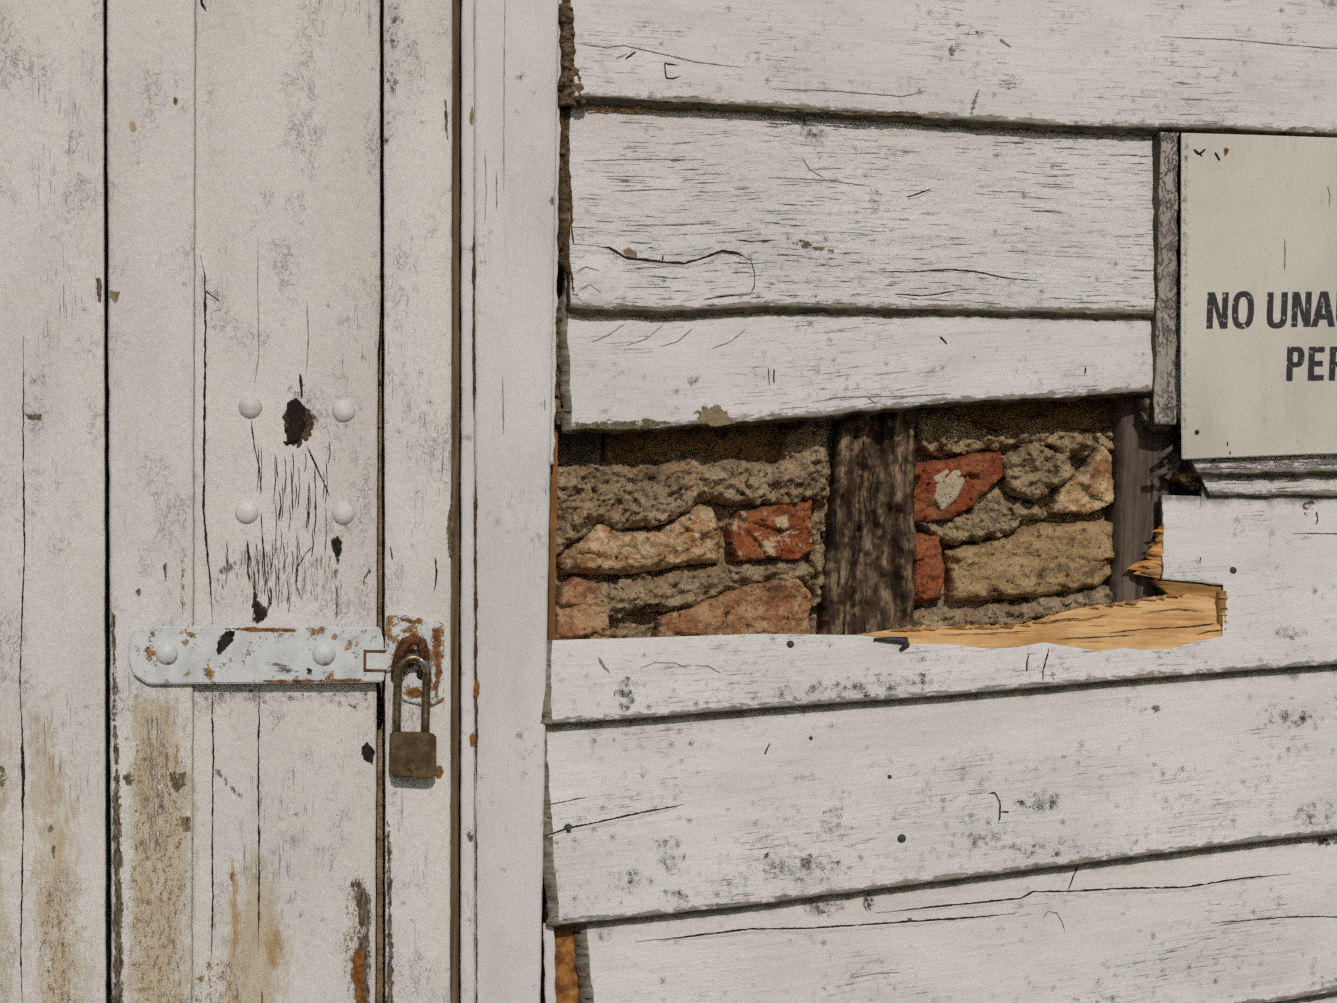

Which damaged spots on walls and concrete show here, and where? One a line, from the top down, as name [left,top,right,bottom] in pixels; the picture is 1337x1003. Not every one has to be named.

crack [558,107,771,299]
crack [592,324,745,348]
peeling [575,418,670,430]
peeling [697,406,735,426]
spalling [932,469,965,511]
rust [400,618,443,699]
peeling [109,609,192,1003]
crack [543,797,684,837]
crack [638,867,1291,942]
crack [1219,915,1337,923]
rust [350,947,368,1003]